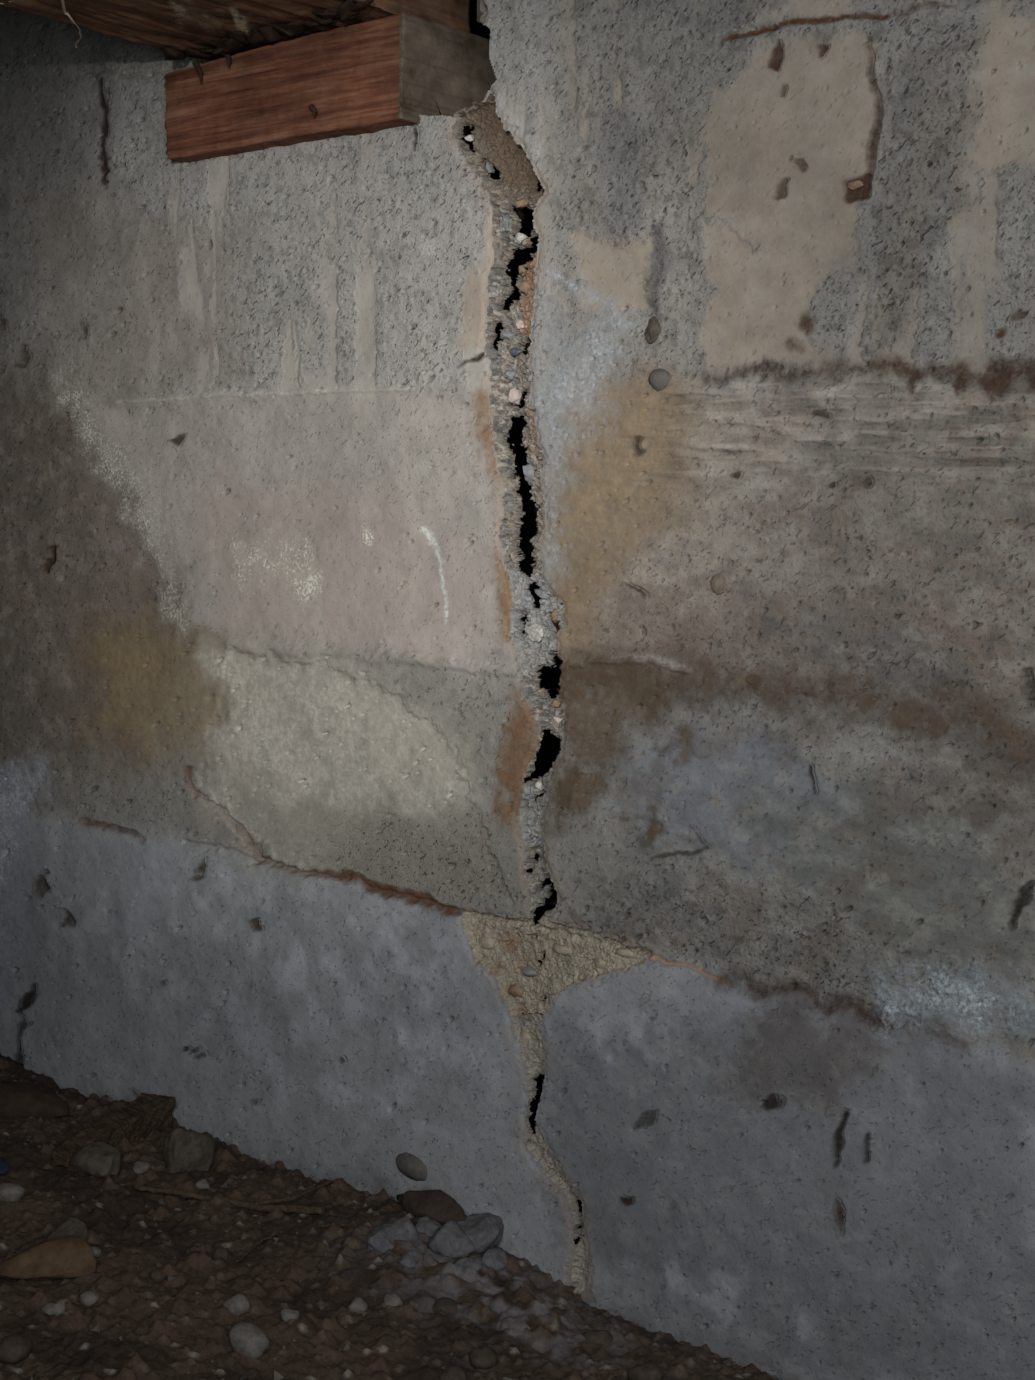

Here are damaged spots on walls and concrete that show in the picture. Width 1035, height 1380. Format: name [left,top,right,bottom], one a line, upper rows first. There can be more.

crack [99,78,110,184]
efflorescence [48,346,193,635]
damp [532,270,1035,813]
crack [414,93,591,1293]
crack [187,767,462,915]